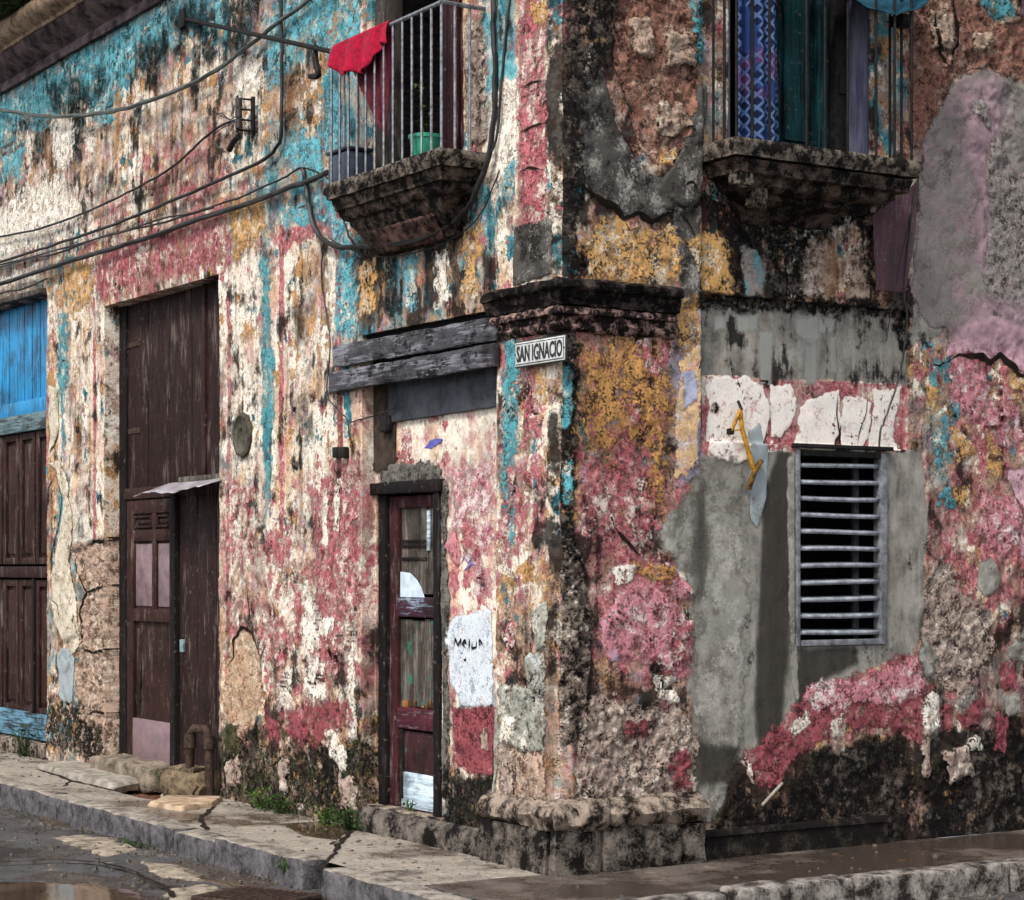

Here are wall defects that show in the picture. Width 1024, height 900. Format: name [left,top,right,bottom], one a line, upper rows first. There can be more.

crack [47,456,120,657]
flaking render [47,230,153,758]
crack [226,593,266,668]
peeling [221,346,378,813]
water stain [559,332,582,549]
peeling [534,215,902,799]
water stain [699,163,913,384]
flaking render [924,97,1024,561]
crack [935,352,1024,377]
crack [185,806,216,830]
water stain [218,727,379,824]
water stain [691,707,1024,841]